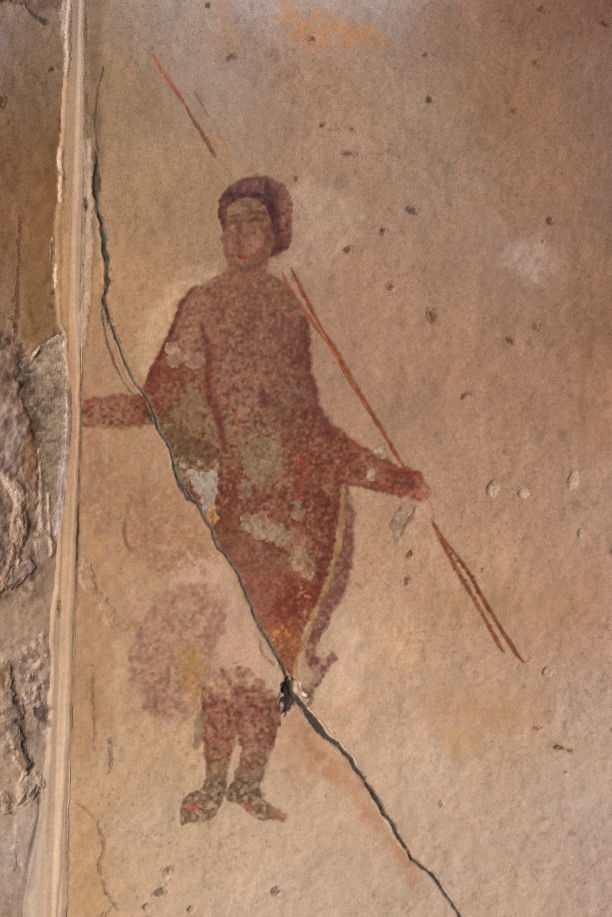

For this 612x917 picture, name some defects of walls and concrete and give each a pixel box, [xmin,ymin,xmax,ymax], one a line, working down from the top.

flaking render [0,297,72,594]
crack [83,65,466,917]
flaking render [0,627,54,815]
crack [74,800,118,917]